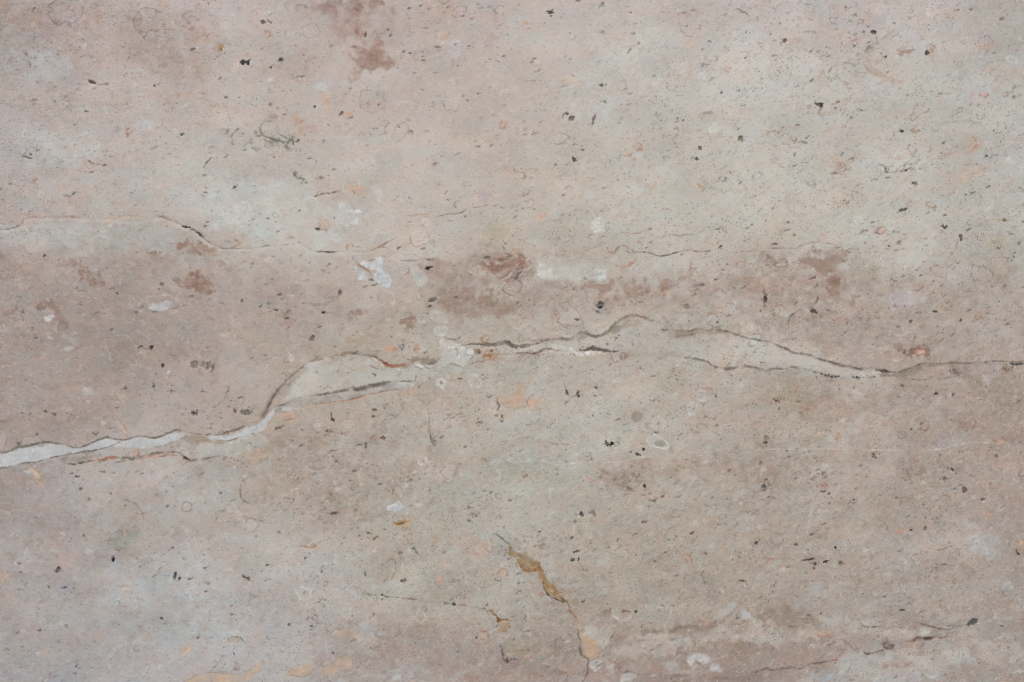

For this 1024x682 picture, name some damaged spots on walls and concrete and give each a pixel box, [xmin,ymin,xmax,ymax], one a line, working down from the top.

crack [0,292,1024,486]